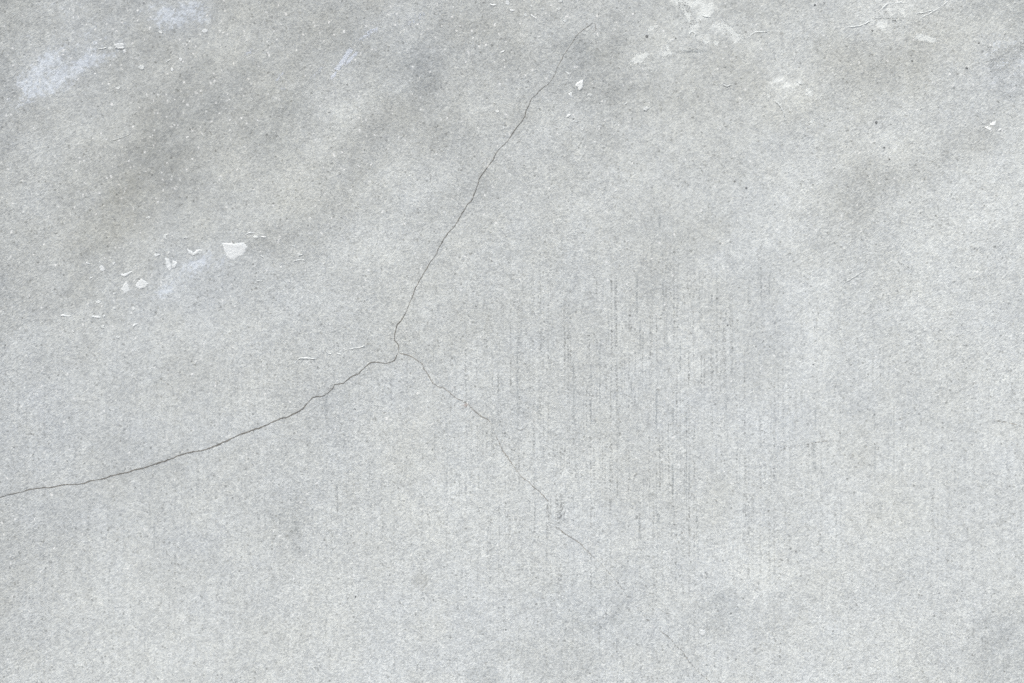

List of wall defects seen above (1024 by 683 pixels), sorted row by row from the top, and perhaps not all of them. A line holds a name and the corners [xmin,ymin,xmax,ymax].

crack [0,17,627,596]